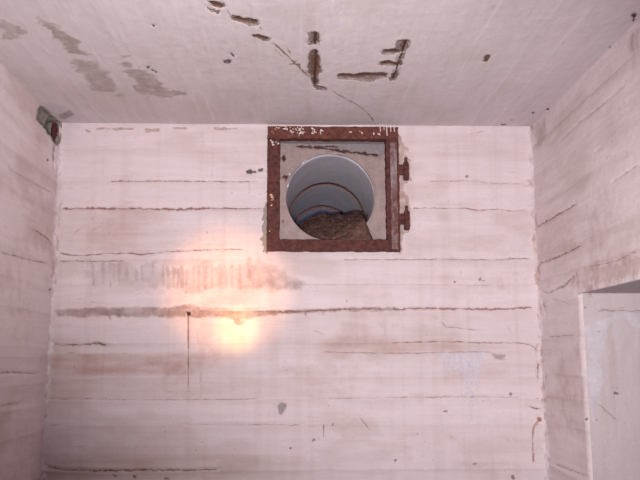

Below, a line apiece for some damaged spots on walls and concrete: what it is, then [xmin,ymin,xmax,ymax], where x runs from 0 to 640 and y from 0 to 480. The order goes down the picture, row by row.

spalling [230,15,259,27]
crack [273,43,309,76]
spalling [307,31,328,90]
spalling [336,39,409,82]